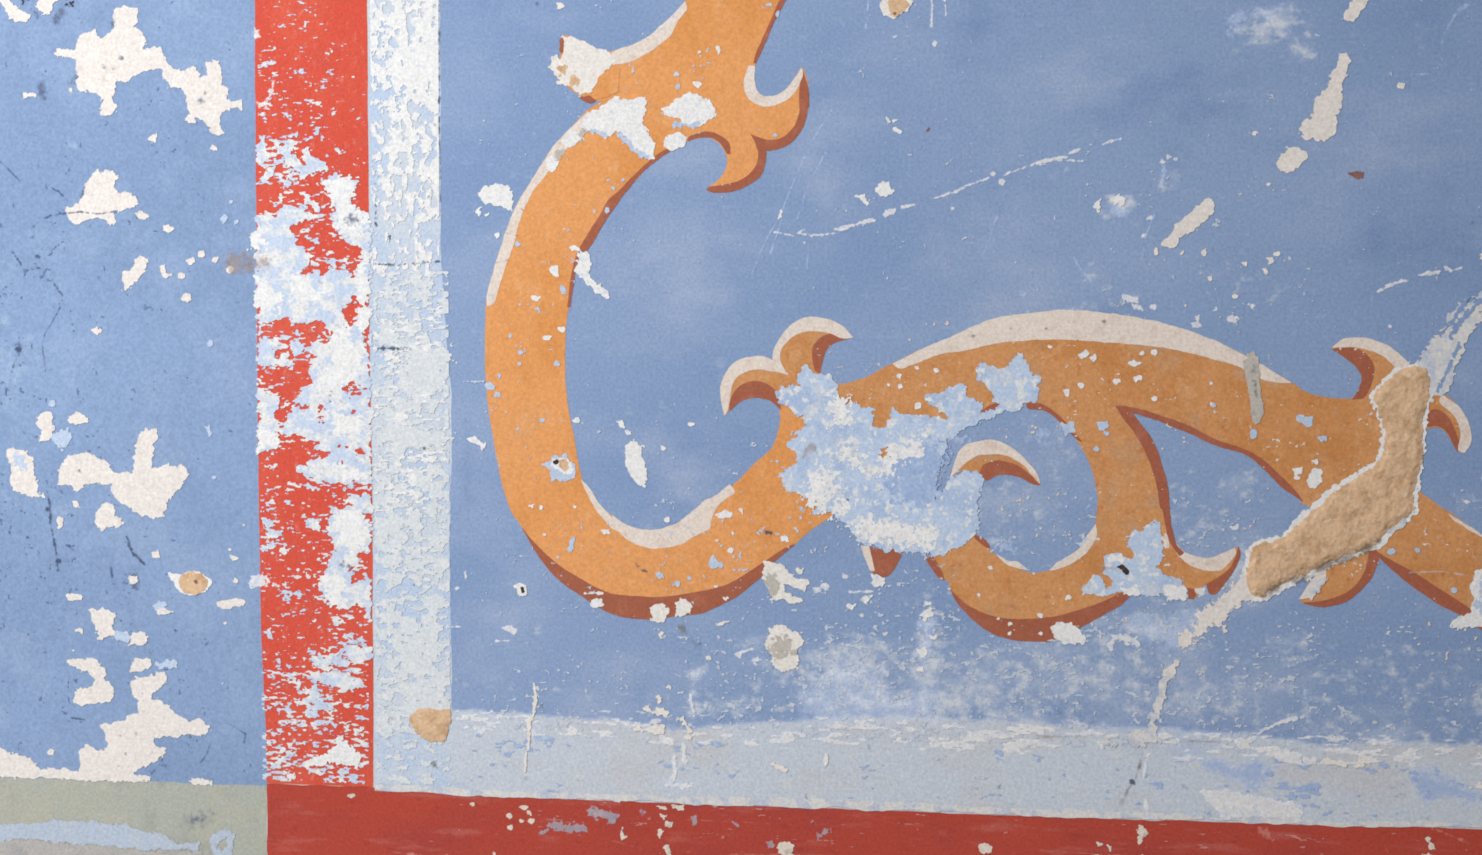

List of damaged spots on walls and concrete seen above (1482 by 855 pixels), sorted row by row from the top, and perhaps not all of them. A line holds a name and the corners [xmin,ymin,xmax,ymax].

peeling [54,5,243,151]
peeling [546,35,727,178]
peeling [6,400,189,531]
peeling [1236,398,1373,489]
peeling [0,593,212,783]
peeling [189,778,213,786]
peeling [766,836,797,855]
peeling [978,843,993,854]